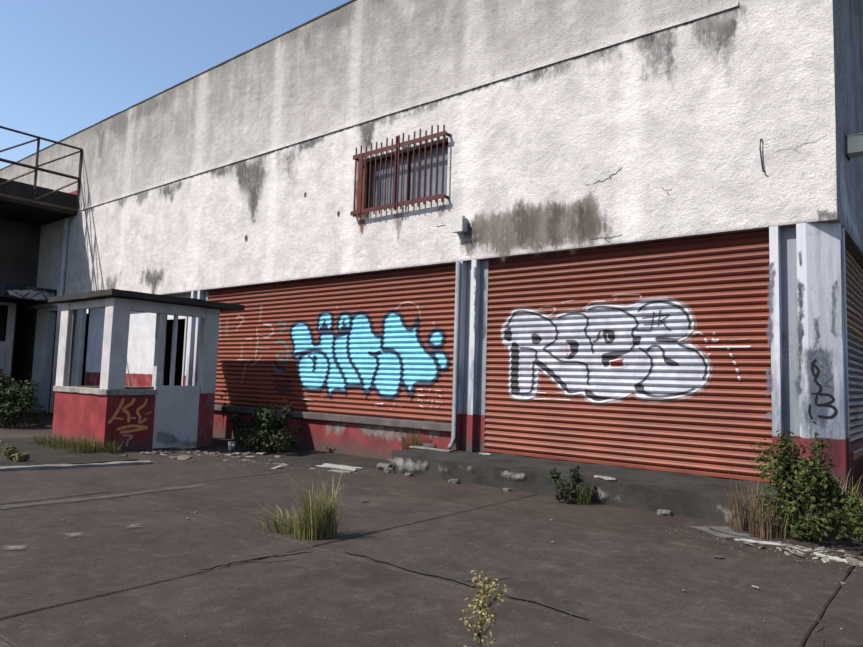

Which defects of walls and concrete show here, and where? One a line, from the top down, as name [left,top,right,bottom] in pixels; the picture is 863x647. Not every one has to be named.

leakage [334,6,741,146]
leakage [83,136,323,222]
leakage [463,194,607,256]
leakage [142,270,163,294]
peeling [767,262,775,347]
peeling [831,241,843,341]
peeling [795,283,834,426]